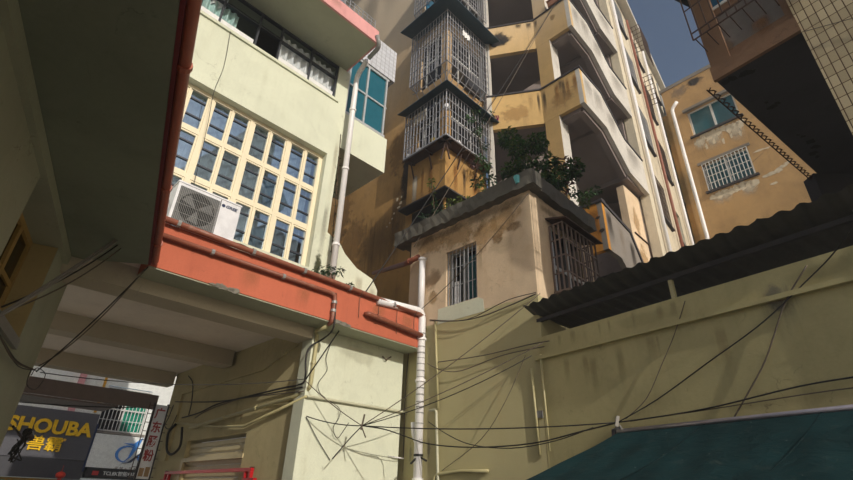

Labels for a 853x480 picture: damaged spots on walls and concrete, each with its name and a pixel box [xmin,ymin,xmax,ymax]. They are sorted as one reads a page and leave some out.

peeling [694,119,744,149]
peeling [710,161,789,200]